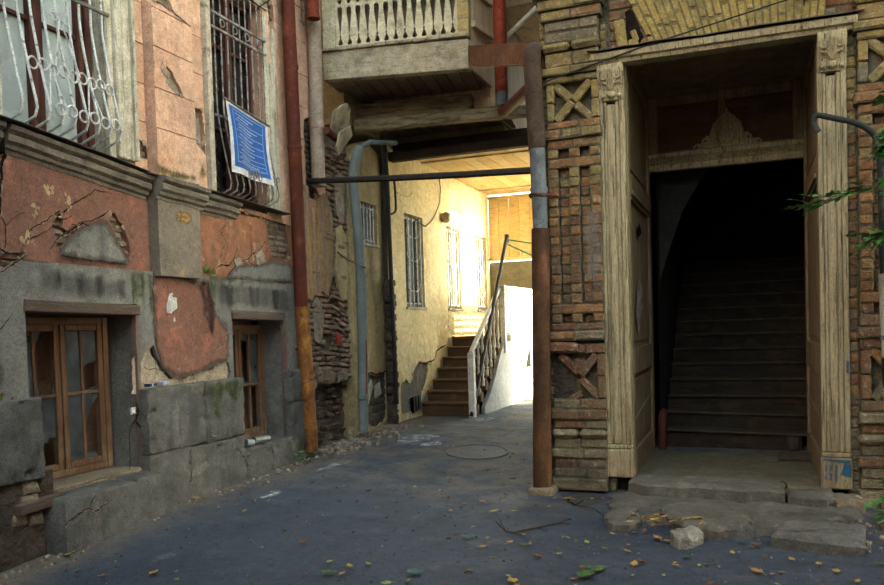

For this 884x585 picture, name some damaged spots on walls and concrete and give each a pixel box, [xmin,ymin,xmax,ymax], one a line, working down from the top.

spalling [162,68,183,98]
spalling [43,184,75,248]
crack [0,130,134,274]
crack [215,218,269,269]
peeling [131,269,231,394]
spalling [368,279,428,427]
crack [57,402,141,535]